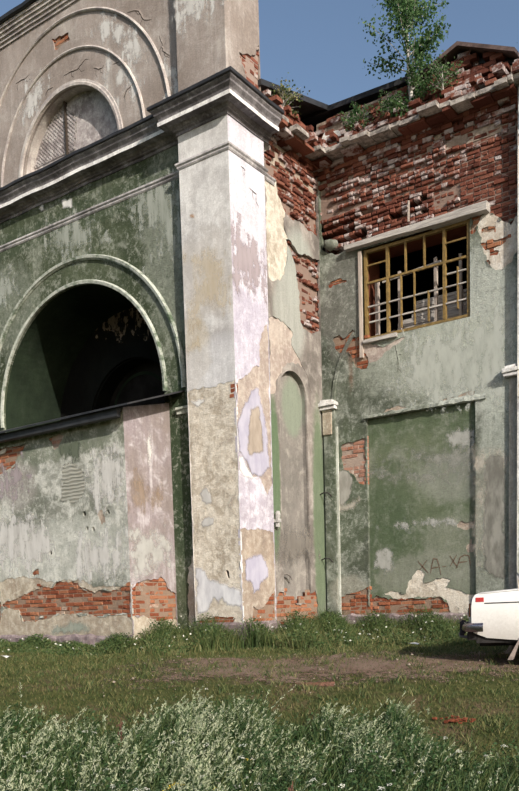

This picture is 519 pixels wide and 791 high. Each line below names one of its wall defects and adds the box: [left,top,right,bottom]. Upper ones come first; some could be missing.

flaking render [53,33,70,50]
crack [127,9,171,57]
crack [45,54,125,95]
spalling [264,103,518,334]
spalling [333,330,405,369]
spalling [0,442,27,474]
peeling [187,315,318,632]
spalling [341,438,369,484]
spalling [0,569,178,640]
spalling [341,569,476,615]